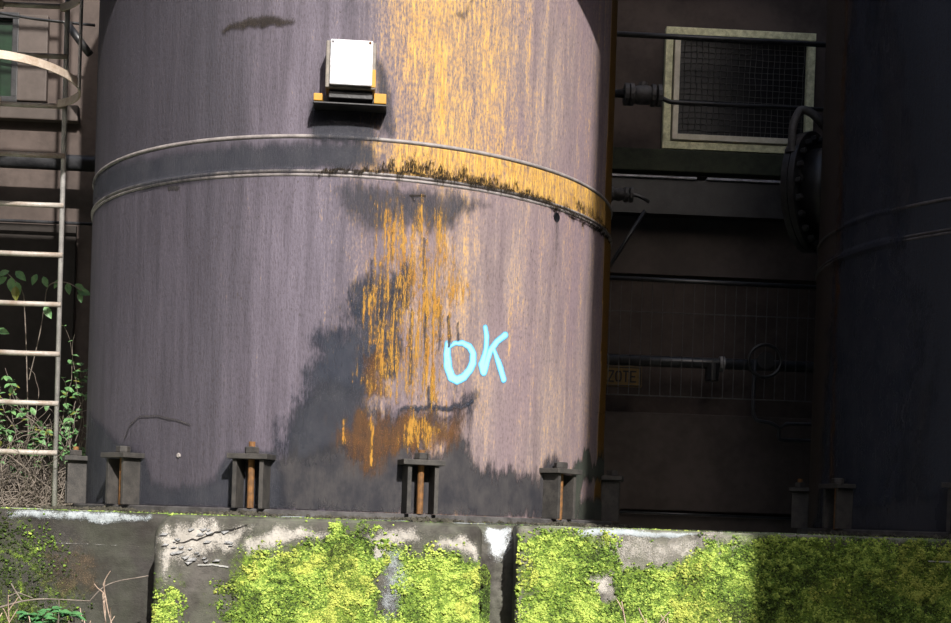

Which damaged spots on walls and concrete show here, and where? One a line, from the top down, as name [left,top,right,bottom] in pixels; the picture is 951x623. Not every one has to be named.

corrosion [337,204,470,474]
spalling [159,518,250,573]